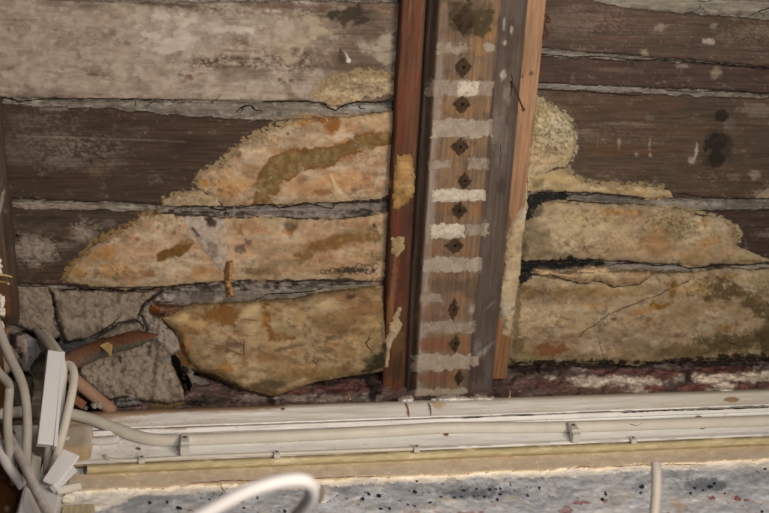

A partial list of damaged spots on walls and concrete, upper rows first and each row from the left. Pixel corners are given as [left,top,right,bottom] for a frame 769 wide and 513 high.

peeling [100,342,113,357]
crack [548,262,765,354]